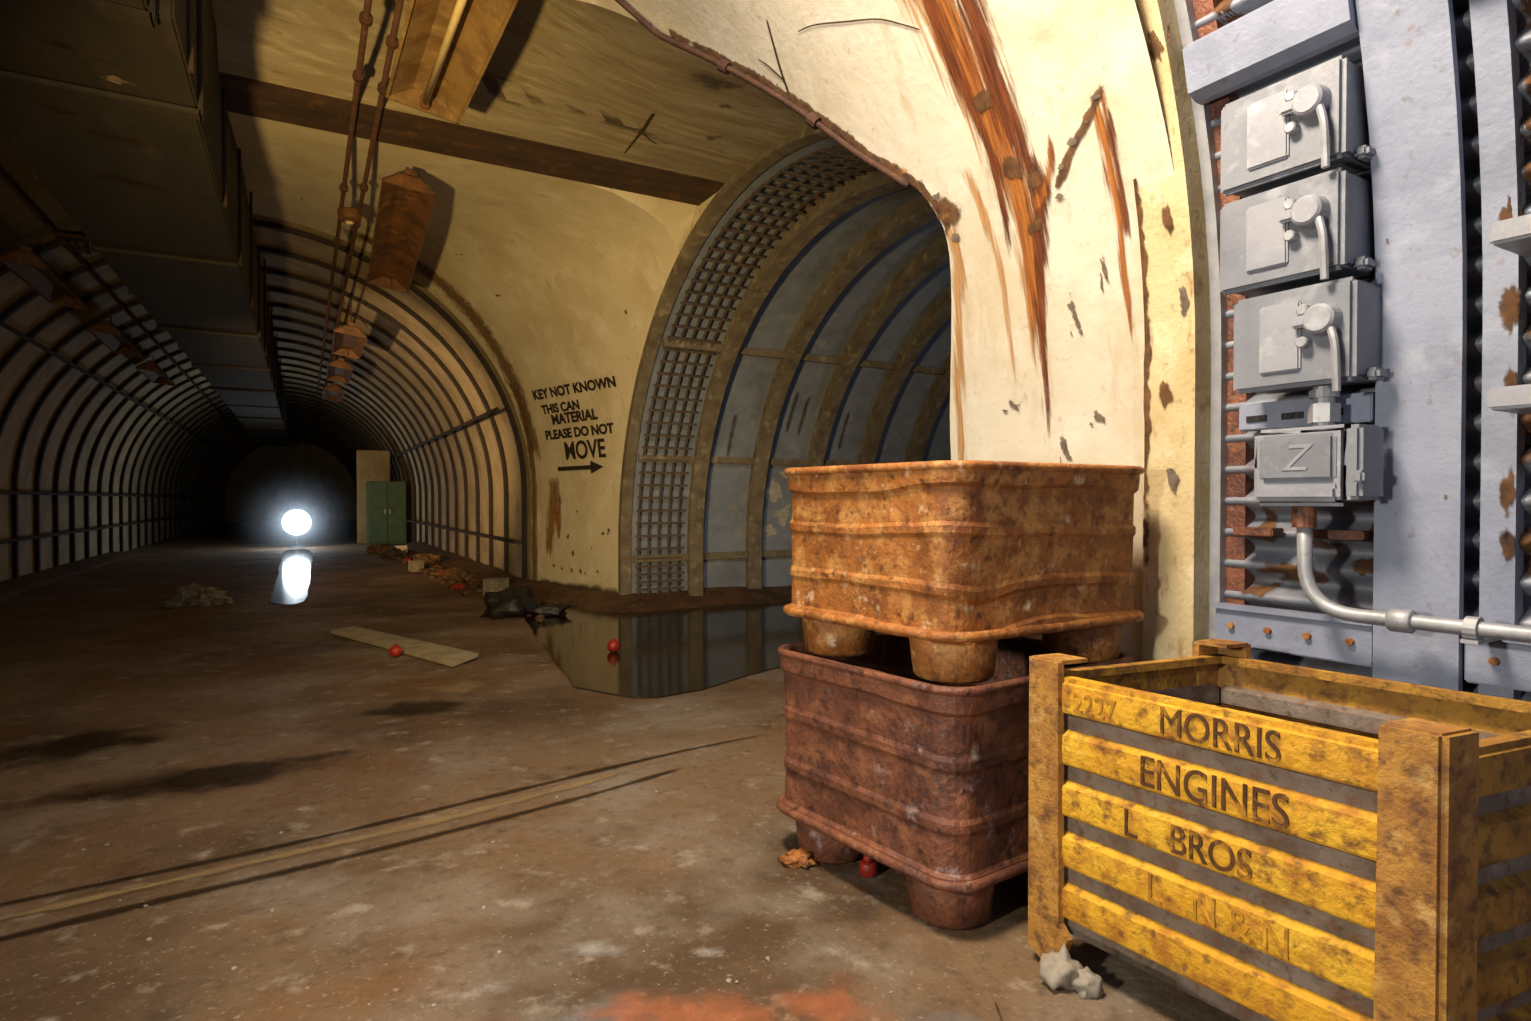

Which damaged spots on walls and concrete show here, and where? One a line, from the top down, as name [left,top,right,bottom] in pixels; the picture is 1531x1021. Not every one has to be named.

corrosion [907,0,1054,460]
corrosion [1091,85,1132,336]
corrosion [1504,369,1517,386]
corrosion [1499,50,1531,221]
corrosion [1499,285,1531,341]
corrosion [1499,414,1531,577]